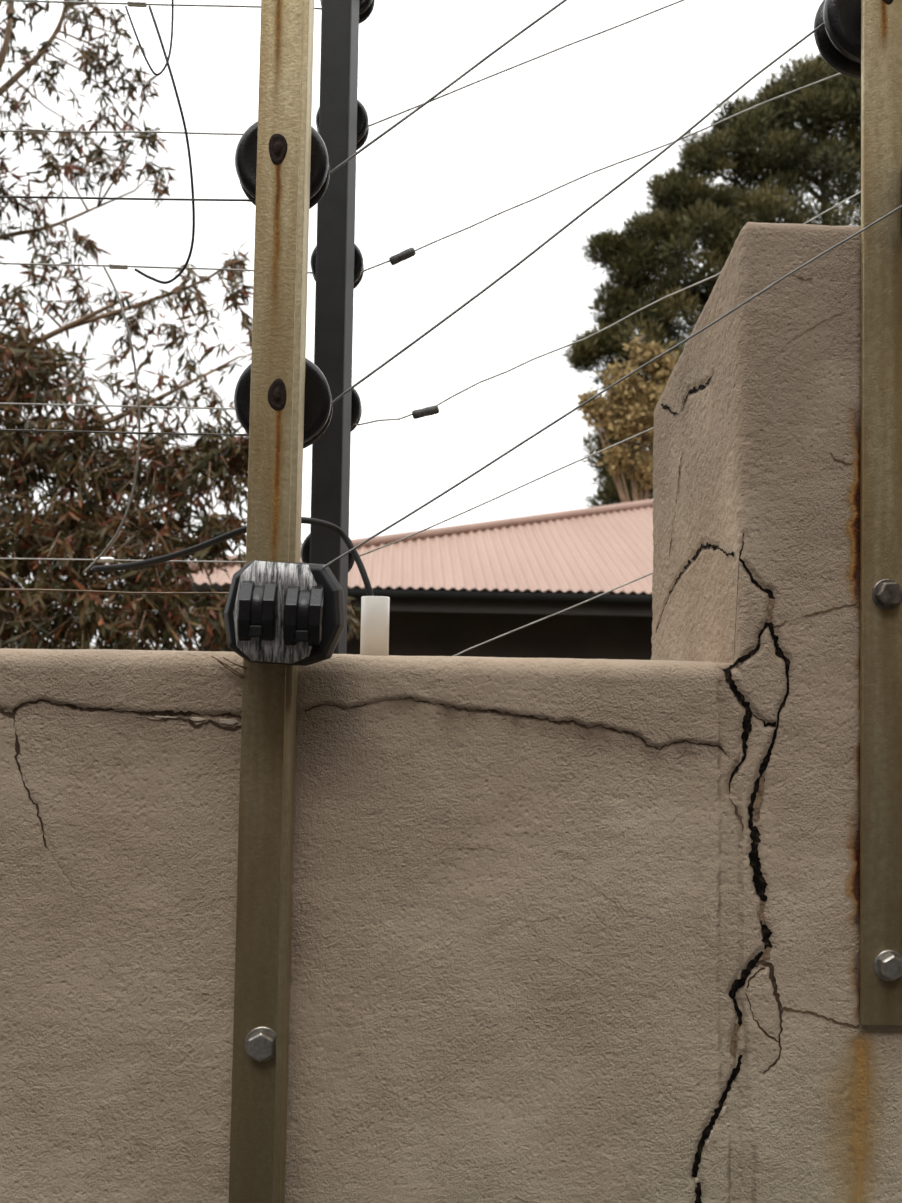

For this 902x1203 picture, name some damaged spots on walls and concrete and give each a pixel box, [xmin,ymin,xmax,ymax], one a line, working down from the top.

crack [0,699,242,890]
crack [304,442,859,1203]